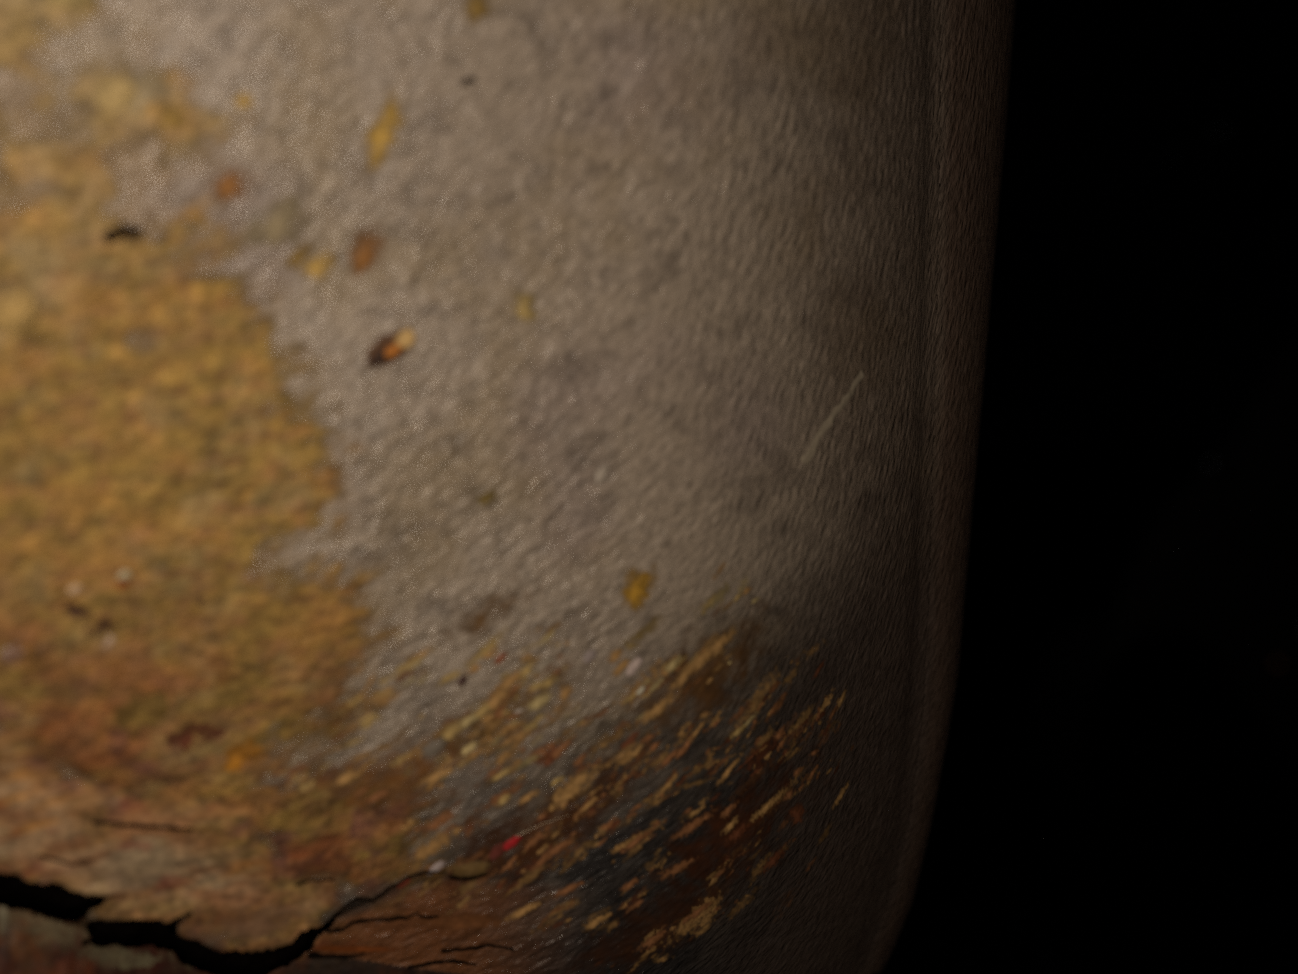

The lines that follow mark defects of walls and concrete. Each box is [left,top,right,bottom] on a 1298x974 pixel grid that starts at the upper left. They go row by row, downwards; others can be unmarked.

crack [92,821,194,831]
crack [0,855,494,974]
crack [406,943,514,969]